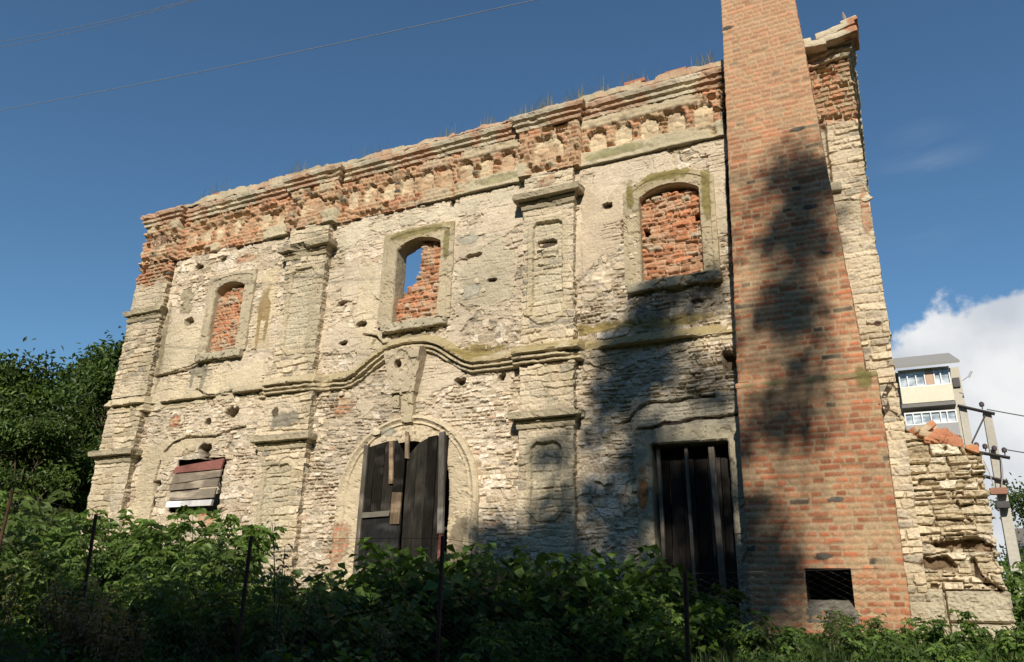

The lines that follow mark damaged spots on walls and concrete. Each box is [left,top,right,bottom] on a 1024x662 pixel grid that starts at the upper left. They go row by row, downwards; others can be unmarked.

leakage [701,170,711,219]
leakage [255,289,271,348]
spalling [326,523,349,573]